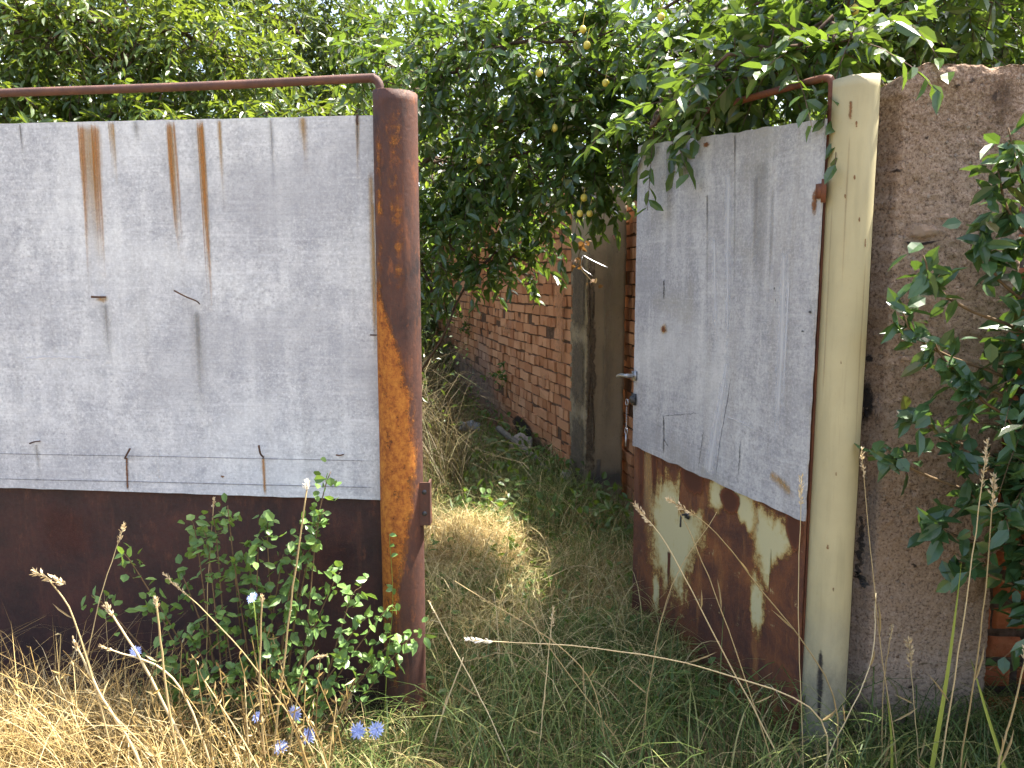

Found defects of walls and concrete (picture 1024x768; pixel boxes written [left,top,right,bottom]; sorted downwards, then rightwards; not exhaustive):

rust [78,125,102,209]
rust [167,125,179,204]
rust [197,125,209,249]
rust [370,178,416,632]